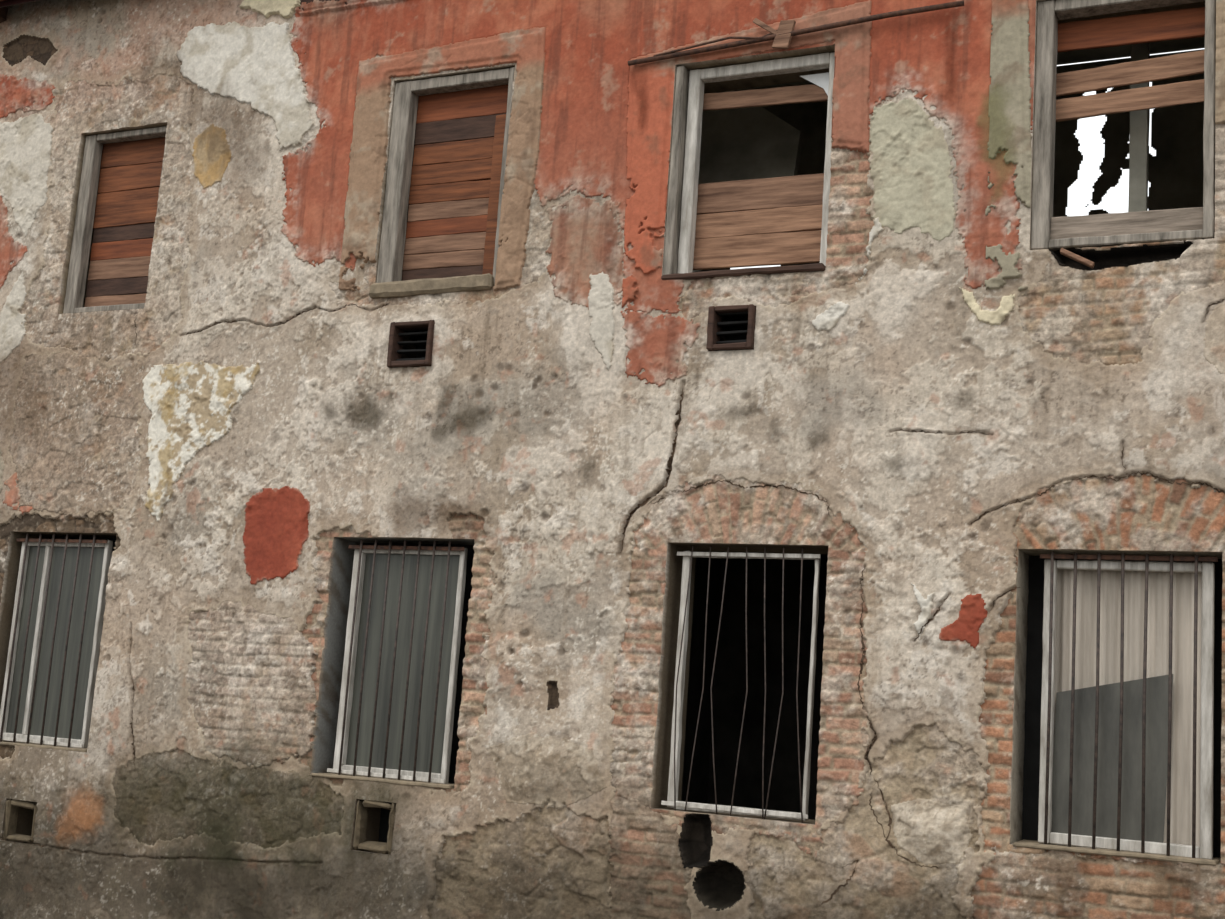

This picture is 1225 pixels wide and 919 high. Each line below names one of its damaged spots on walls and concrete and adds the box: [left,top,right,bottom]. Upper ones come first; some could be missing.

crack [183,303,387,336]
peeling [0,0,1225,603]
crack [620,390,830,553]
flaking render [0,745,15,759]
flaking render [112,486,372,849]
flaking render [428,474,1225,919]
crack [2,838,321,865]